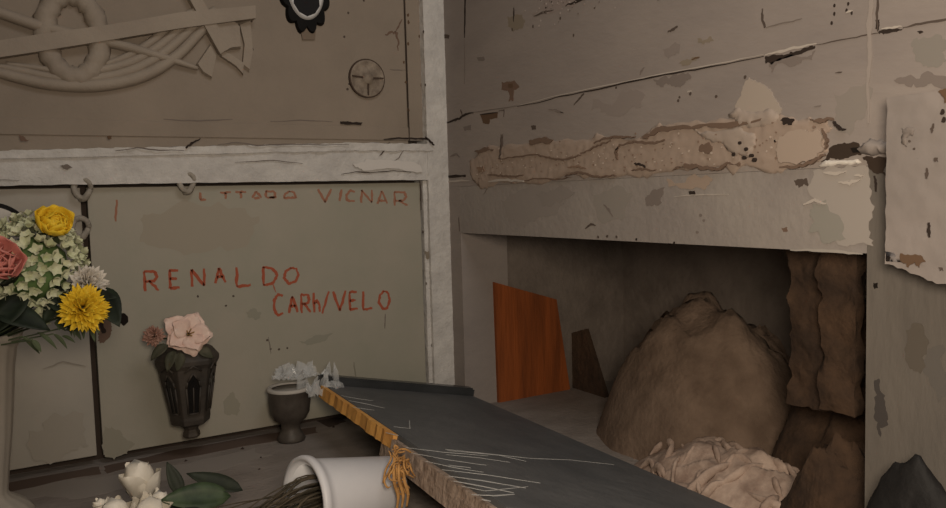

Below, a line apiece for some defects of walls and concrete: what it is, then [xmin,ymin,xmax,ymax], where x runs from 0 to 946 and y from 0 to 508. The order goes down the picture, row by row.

crack [461,0,469,38]
crack [513,0,582,22]
crack [344,0,434,210]
crack [447,56,764,195]
peeling [470,114,887,247]
spalling [930,88,946,133]